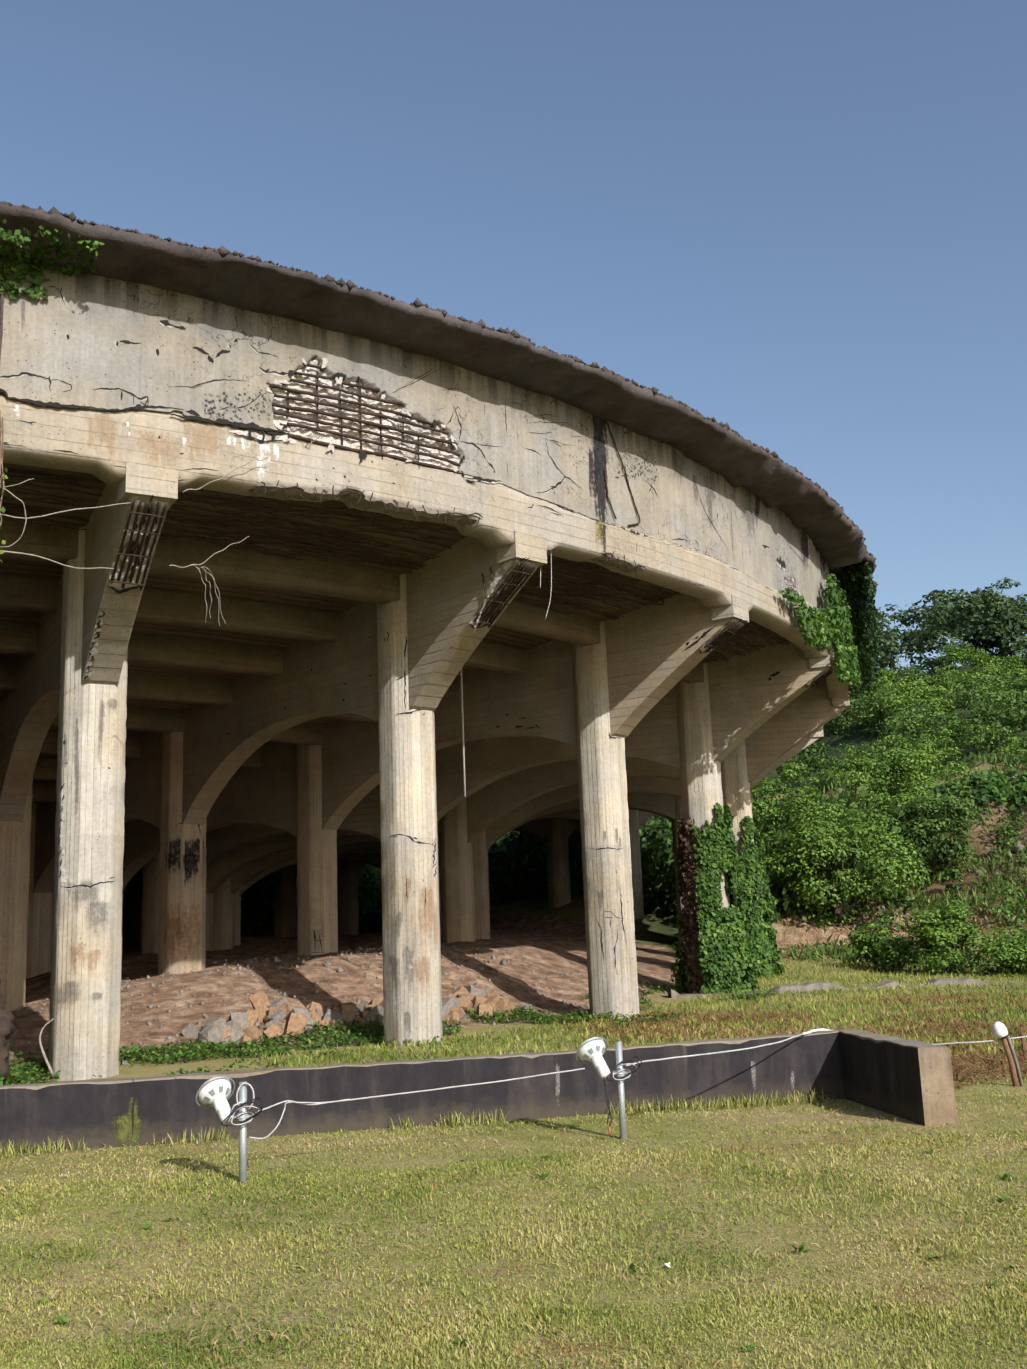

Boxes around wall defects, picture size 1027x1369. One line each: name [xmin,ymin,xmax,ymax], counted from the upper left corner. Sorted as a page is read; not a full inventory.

crack [0,342,288,405]
crack [3,420,77,454]
spalling [204,358,483,528]
crack [393,367,590,515]
damp [589,416,608,550]
spalling [107,495,168,594]
spalling [468,557,537,633]
spalling [84,610,105,680]
damp [166,838,204,881]